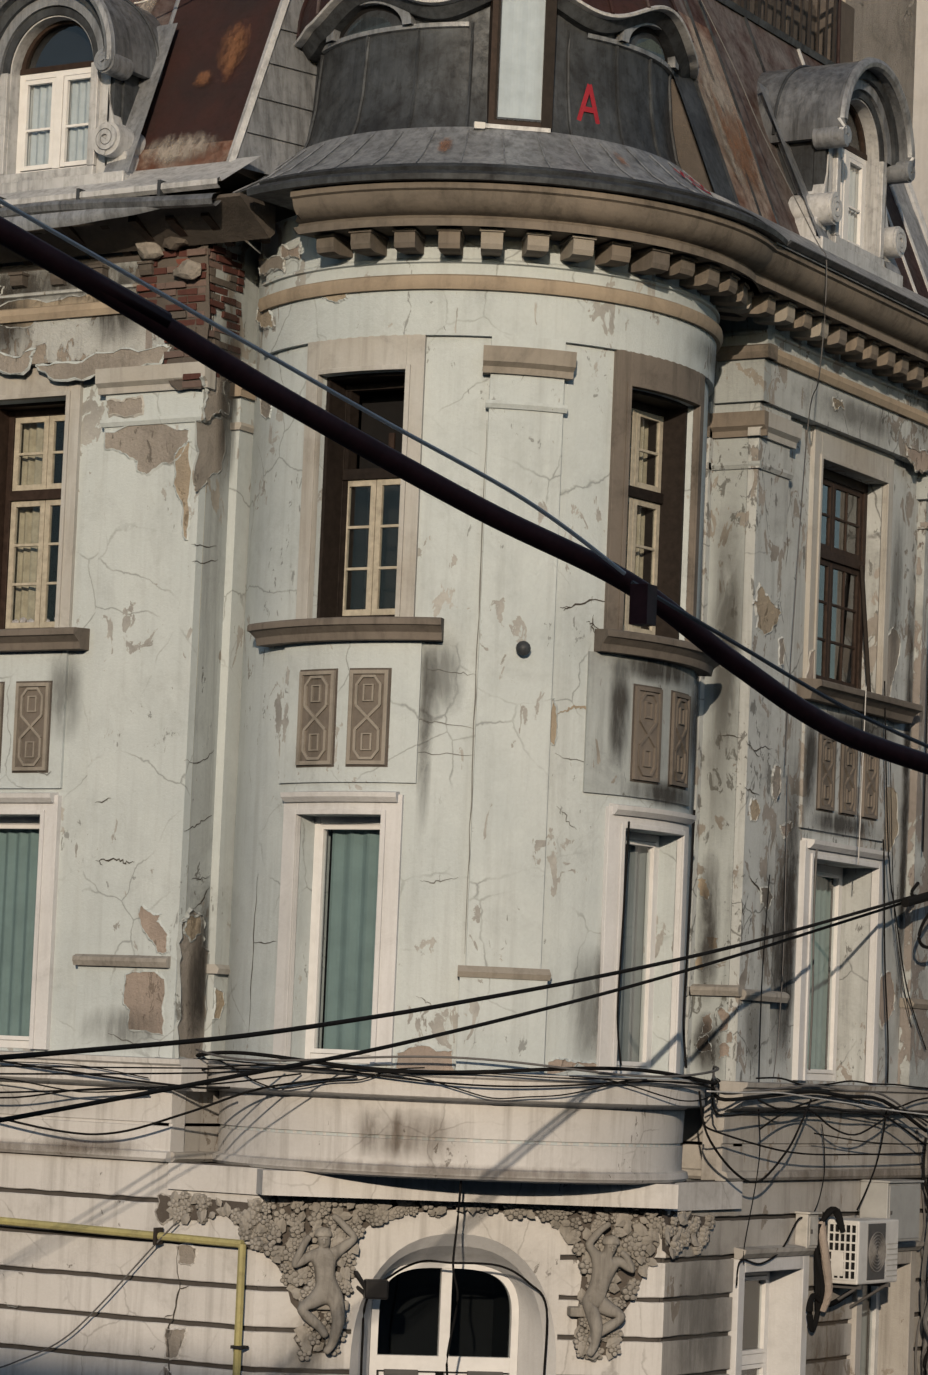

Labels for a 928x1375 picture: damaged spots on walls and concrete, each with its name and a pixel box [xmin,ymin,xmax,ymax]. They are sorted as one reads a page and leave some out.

rust [197,30,244,83]
flaking render [78,237,301,359]
peeling [0,341,230,541]
peeling [905,443,928,474]
crack [560,599,605,633]
peeling [752,582,786,667]
crack [418,430,487,941]
crack [557,705,586,714]
crack [96,857,133,865]
leakage [786,730,815,994]
leakage [702,891,715,977]
spalling [122,904,225,1059]